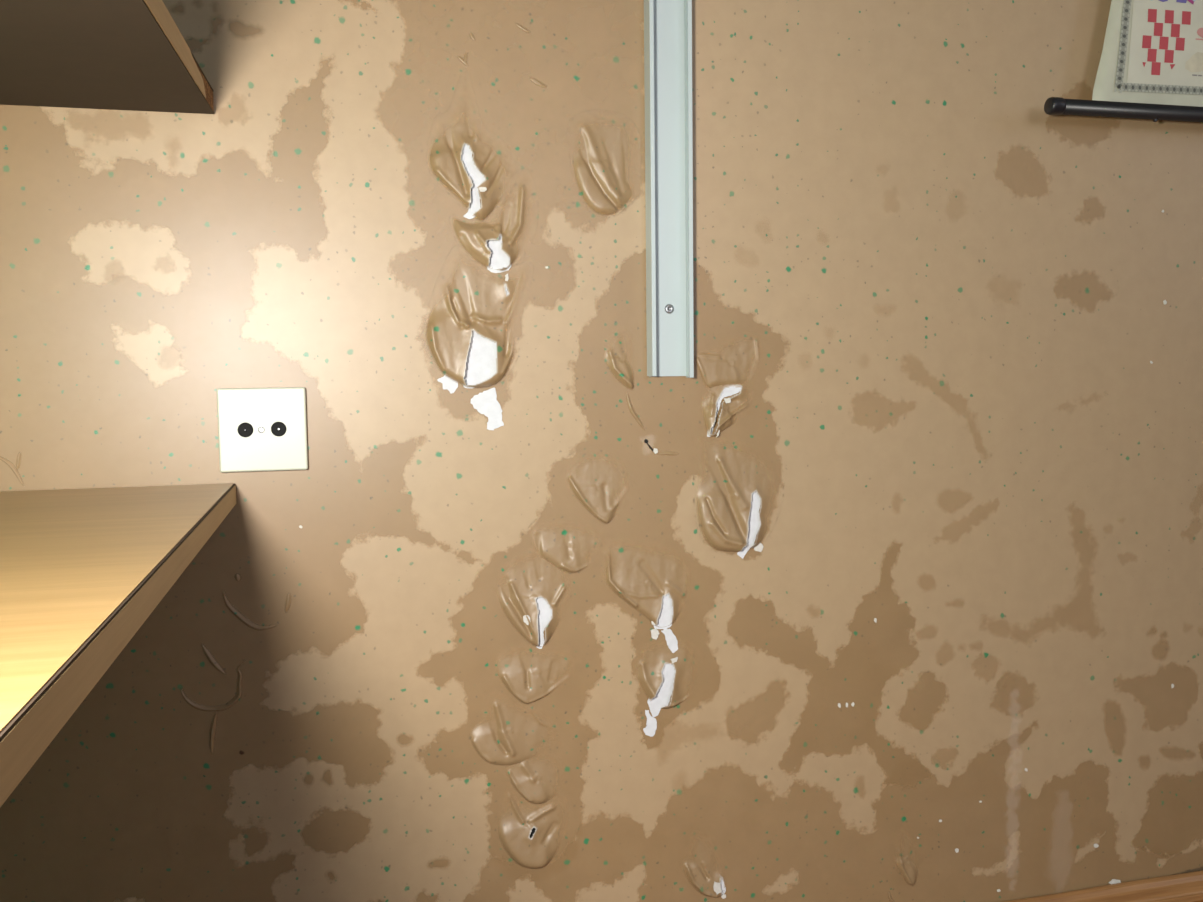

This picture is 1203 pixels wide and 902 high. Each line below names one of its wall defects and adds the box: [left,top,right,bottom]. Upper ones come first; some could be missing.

water stain [186,18,260,51]
water stain [380,0,645,307]
water stain [0,59,477,902]
water stain [417,250,1203,902]